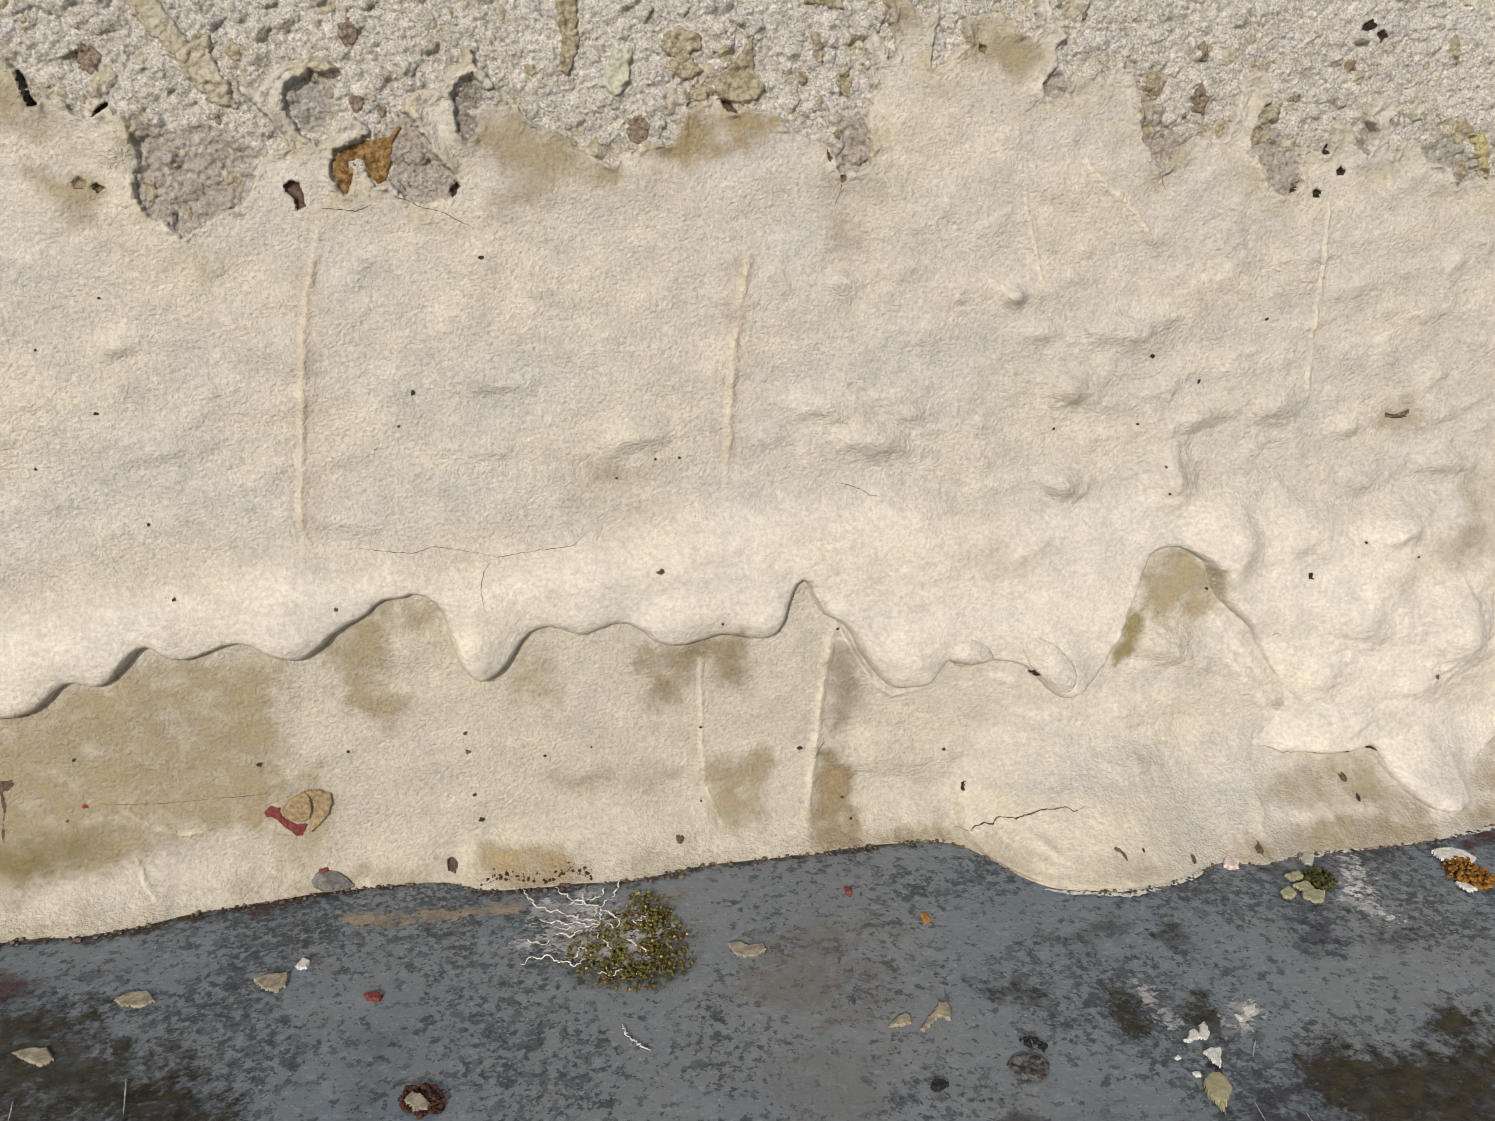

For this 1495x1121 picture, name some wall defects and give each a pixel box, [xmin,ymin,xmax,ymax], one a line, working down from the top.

peeling [72,43,117,104]
peeling [128,0,242,125]
peeling [312,0,358,48]
peeling [555,0,580,76]
peeling [660,25,766,115]
peeling [1181,23,1257,137]
spalling [328,91,402,194]
peeling [626,114,651,144]
leakage [346,611,398,715]
leakage [0,662,274,875]
leakage [813,751,859,843]
crack [955,806,1085,831]